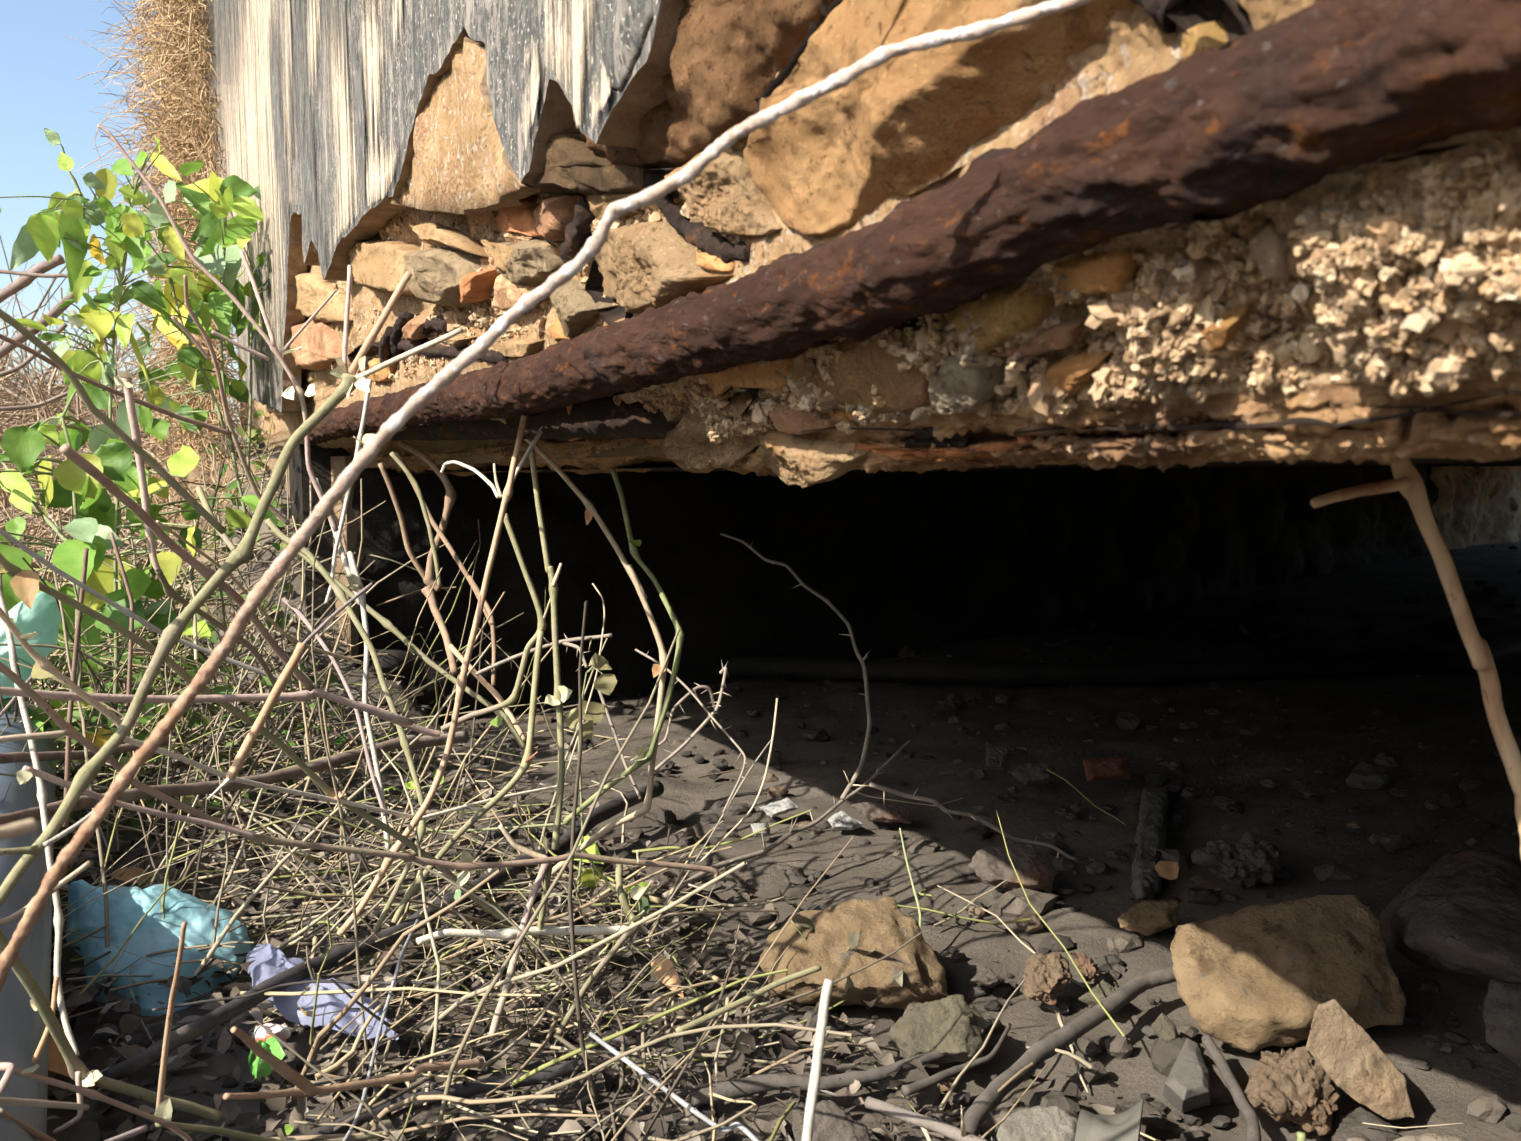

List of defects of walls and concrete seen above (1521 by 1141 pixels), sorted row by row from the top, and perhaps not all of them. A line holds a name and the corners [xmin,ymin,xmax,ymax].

corrosion [1375,141,1476,163]
spalling [211,0,1521,488]
corrosion [855,436,1048,464]